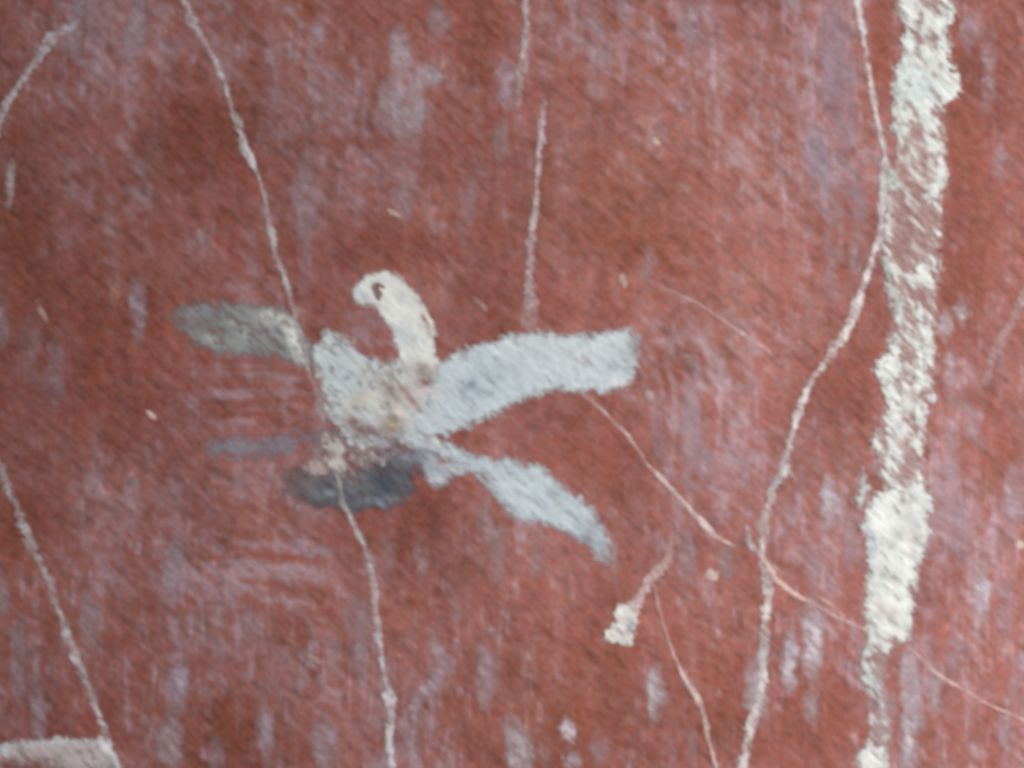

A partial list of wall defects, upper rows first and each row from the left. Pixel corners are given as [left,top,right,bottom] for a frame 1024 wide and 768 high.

crack [0,23,76,124]
crack [516,0,530,85]
crack [182,0,310,371]
crack [524,110,546,308]
crack [599,0,890,768]
crack [5,483,117,768]
crack [336,476,397,768]
damp [881,655,920,766]
crack [911,649,1024,722]